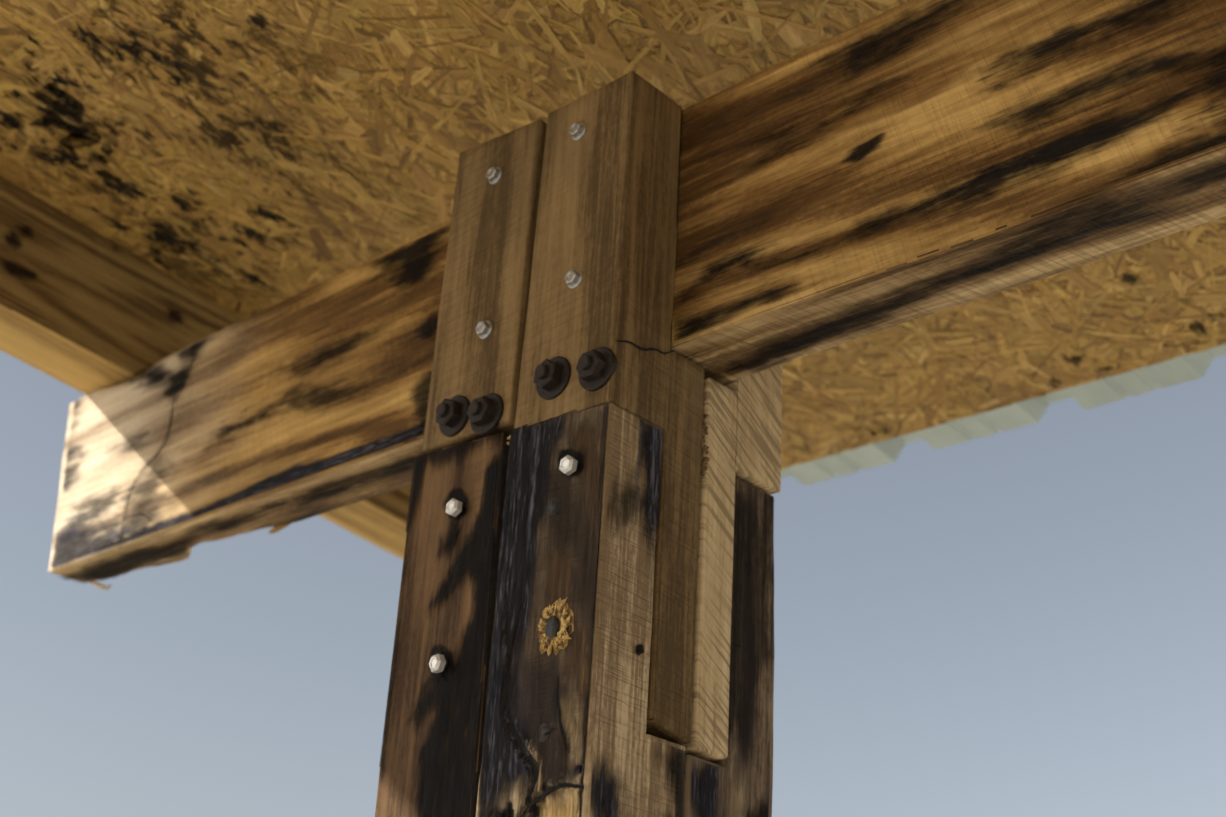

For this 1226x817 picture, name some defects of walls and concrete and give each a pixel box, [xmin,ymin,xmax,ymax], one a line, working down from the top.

leakage [0,0,322,290]
crack [119,353,197,551]
crack [615,340,675,354]
crack [496,588,583,817]